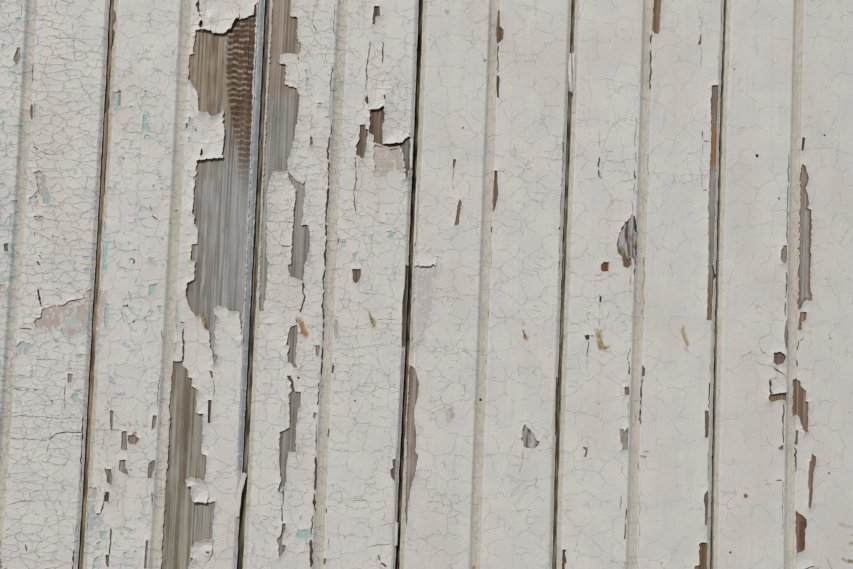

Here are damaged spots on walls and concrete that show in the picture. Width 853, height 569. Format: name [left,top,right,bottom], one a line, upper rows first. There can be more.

crack [195,0,203,30]
crack [647,35,655,89]
peeling [353,43,413,212]
crack [11,374,84,495]
peeling [161,0,311,569]
crack [309,125,332,567]
peeling [402,255,438,347]
spalling [616,202,638,276]
crack [627,351,643,426]
peeling [700,85,718,320]
peeling [741,164,815,467]
crack [783,154,791,243]